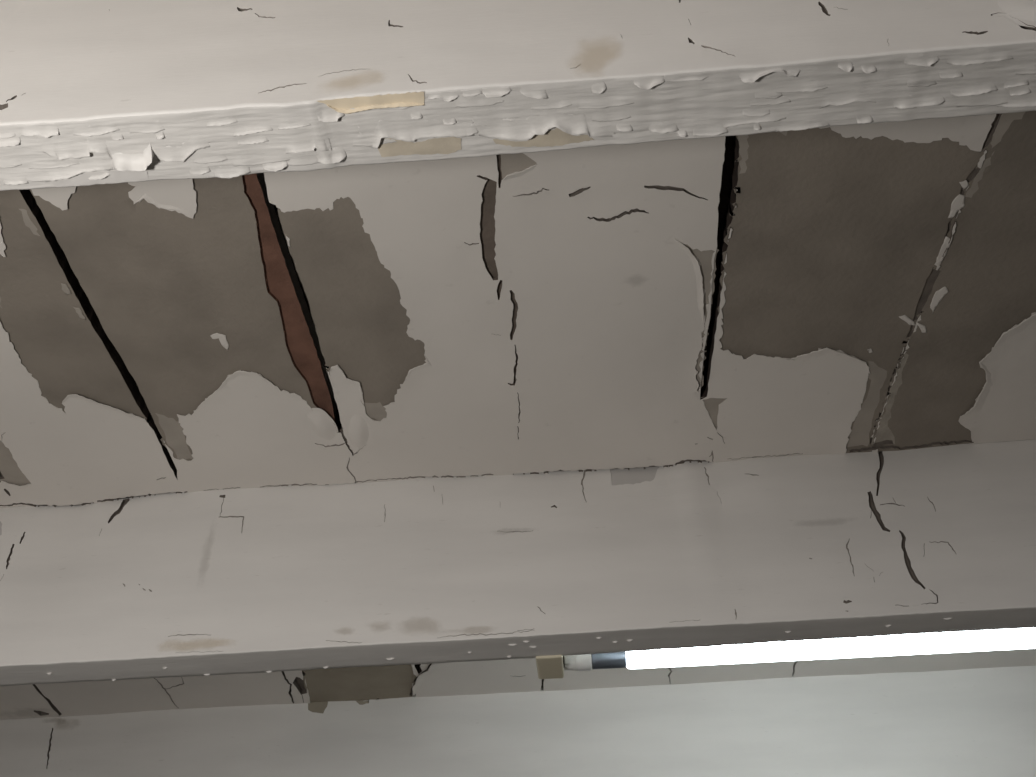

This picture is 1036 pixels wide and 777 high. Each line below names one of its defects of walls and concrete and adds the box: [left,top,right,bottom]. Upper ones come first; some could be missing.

peeling [632,72,709,90]
peeling [0,80,634,461]
crack [464,155,708,439]
peeling [649,49,1036,453]
crack [846,114,1002,606]
peeling [0,441,32,489]
crack [0,429,596,535]
crack [628,433,803,504]
crack [0,532,25,581]
peeling [302,658,442,713]